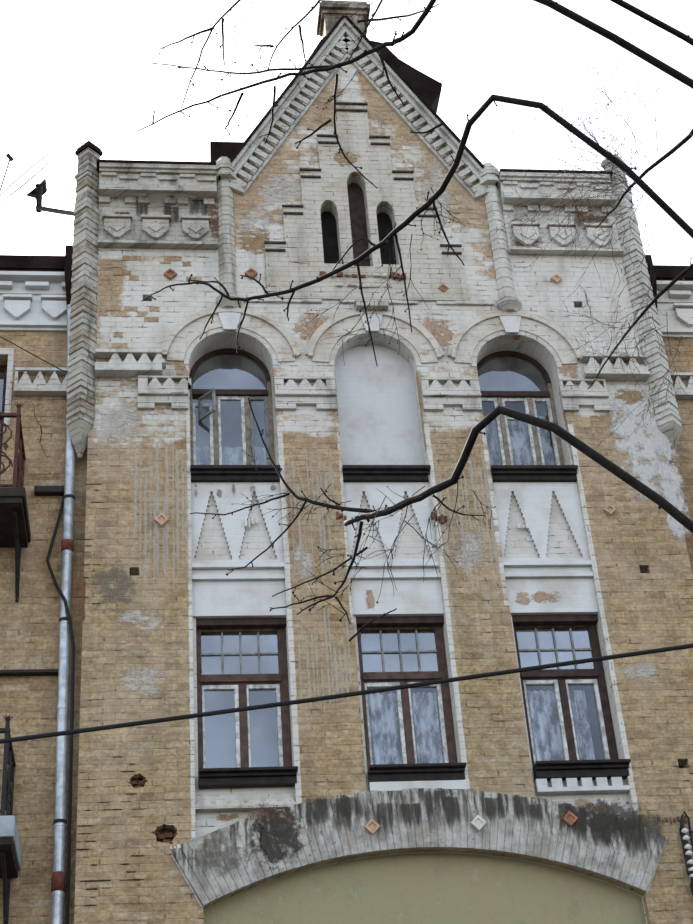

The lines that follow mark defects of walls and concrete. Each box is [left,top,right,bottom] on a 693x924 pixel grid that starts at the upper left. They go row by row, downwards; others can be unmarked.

peeling [239,228,270,254]
peeling [160,256,202,282]
peeling [98,306,160,322]
peeling [614,389,645,404]
peeling [366,590,375,608]
peeling [516,591,557,605]
hole [128,774,148,788]
water stain [376,790,460,830]
water stain [484,796,543,821]
spalling [150,825,182,850]
water stain [249,797,363,868]
water stain [558,798,662,853]